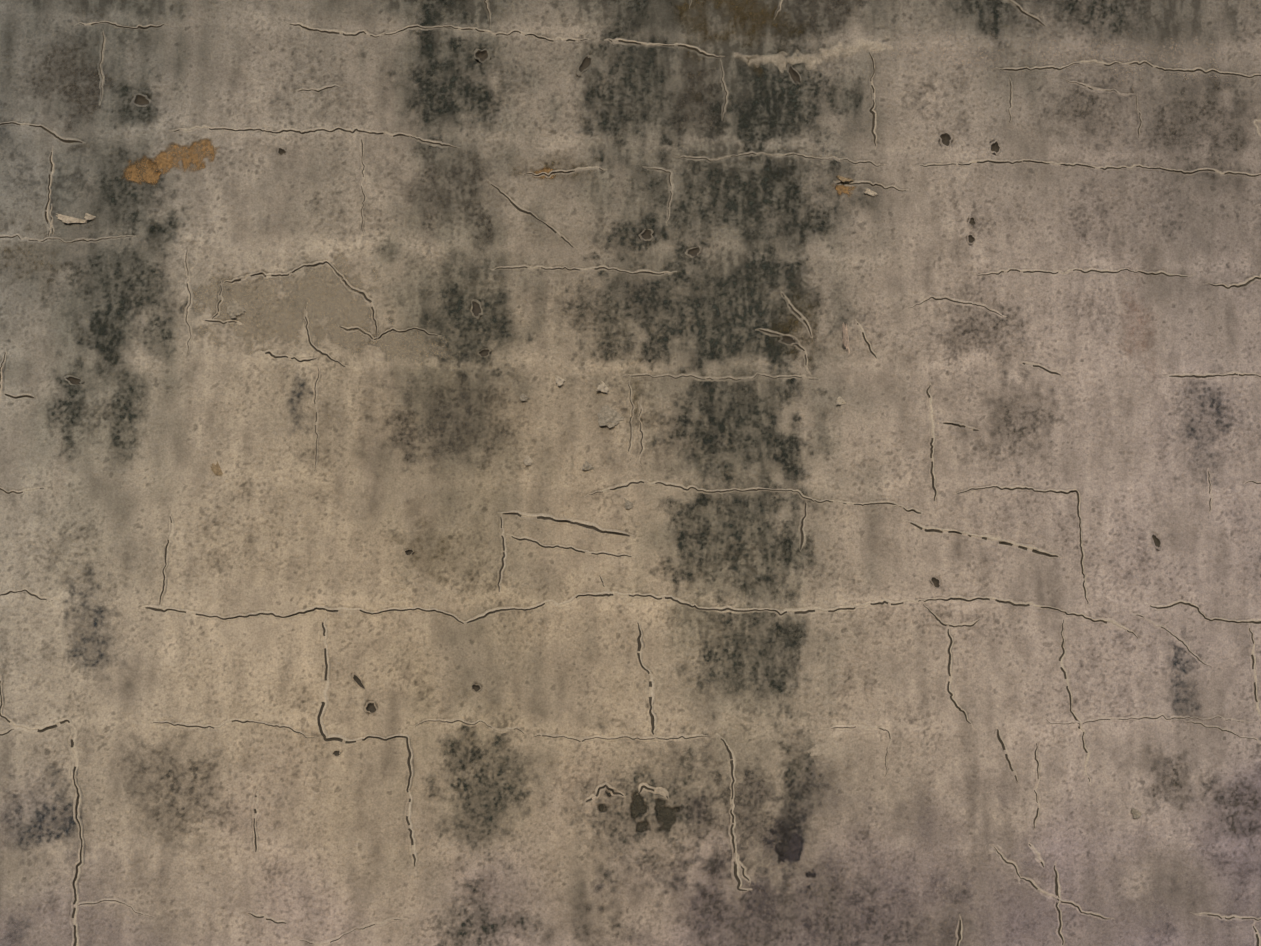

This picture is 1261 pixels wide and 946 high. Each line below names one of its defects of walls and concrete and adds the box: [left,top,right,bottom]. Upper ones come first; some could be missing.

damp [412,0,492,123]
crack [285,0,730,121]
flaking render [56,213,96,224]
spalling [124,139,216,184]
damp [585,32,861,366]
crack [642,51,1261,226]
damp [71,249,171,448]
crack [903,267,1261,318]
damp [653,381,800,480]
crack [136,291,1261,946]
crack [0,671,155,946]
spalling [583,782,679,832]